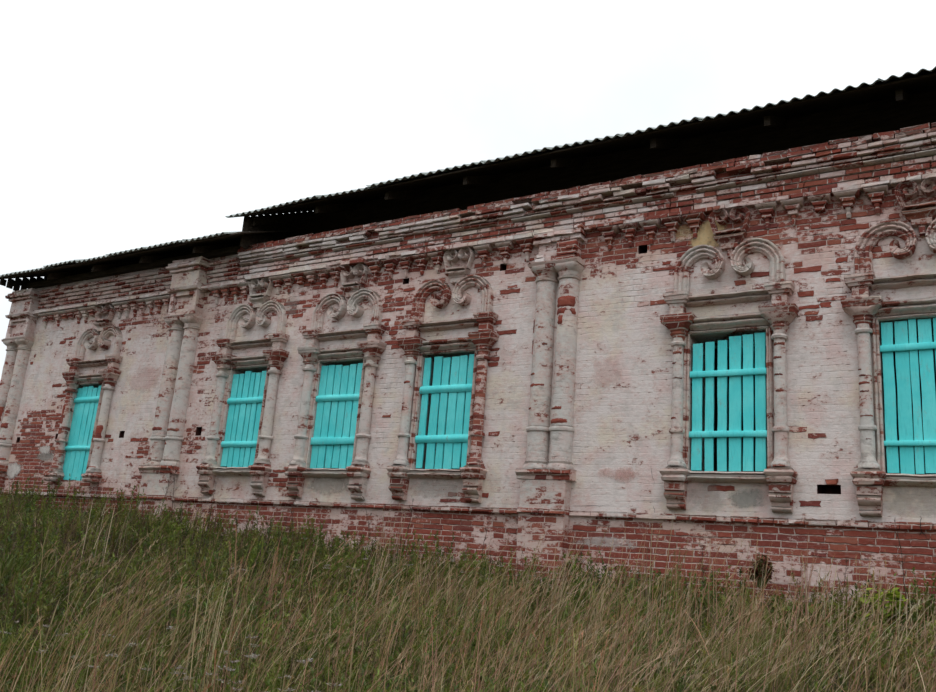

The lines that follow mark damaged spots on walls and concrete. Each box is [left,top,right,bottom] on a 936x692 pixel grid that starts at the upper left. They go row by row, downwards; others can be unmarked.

flaking render [733,201,900,241]
flaking render [474,244,534,271]
flaking render [638,236,696,271]
flaking render [872,242,893,259]
flaking render [499,285,520,295]
flaking render [734,271,769,286]
flaking render [794,265,840,283]
spalling [557,295,576,324]
flaking render [797,290,847,321]
flaking render [0,383,67,477]
spalling [799,479,841,507]
flaking render [794,528,936,563]